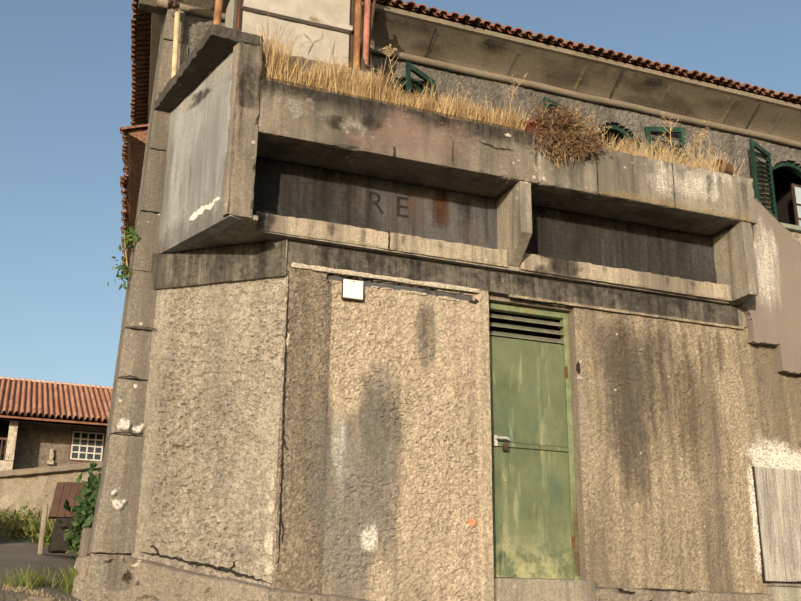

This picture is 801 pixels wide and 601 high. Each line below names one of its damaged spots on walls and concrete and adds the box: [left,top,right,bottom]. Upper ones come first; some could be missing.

peeling [189,197,220,221]
damp [312,371,401,597]
damp [606,320,661,487]
spalling [105,556,142,585]